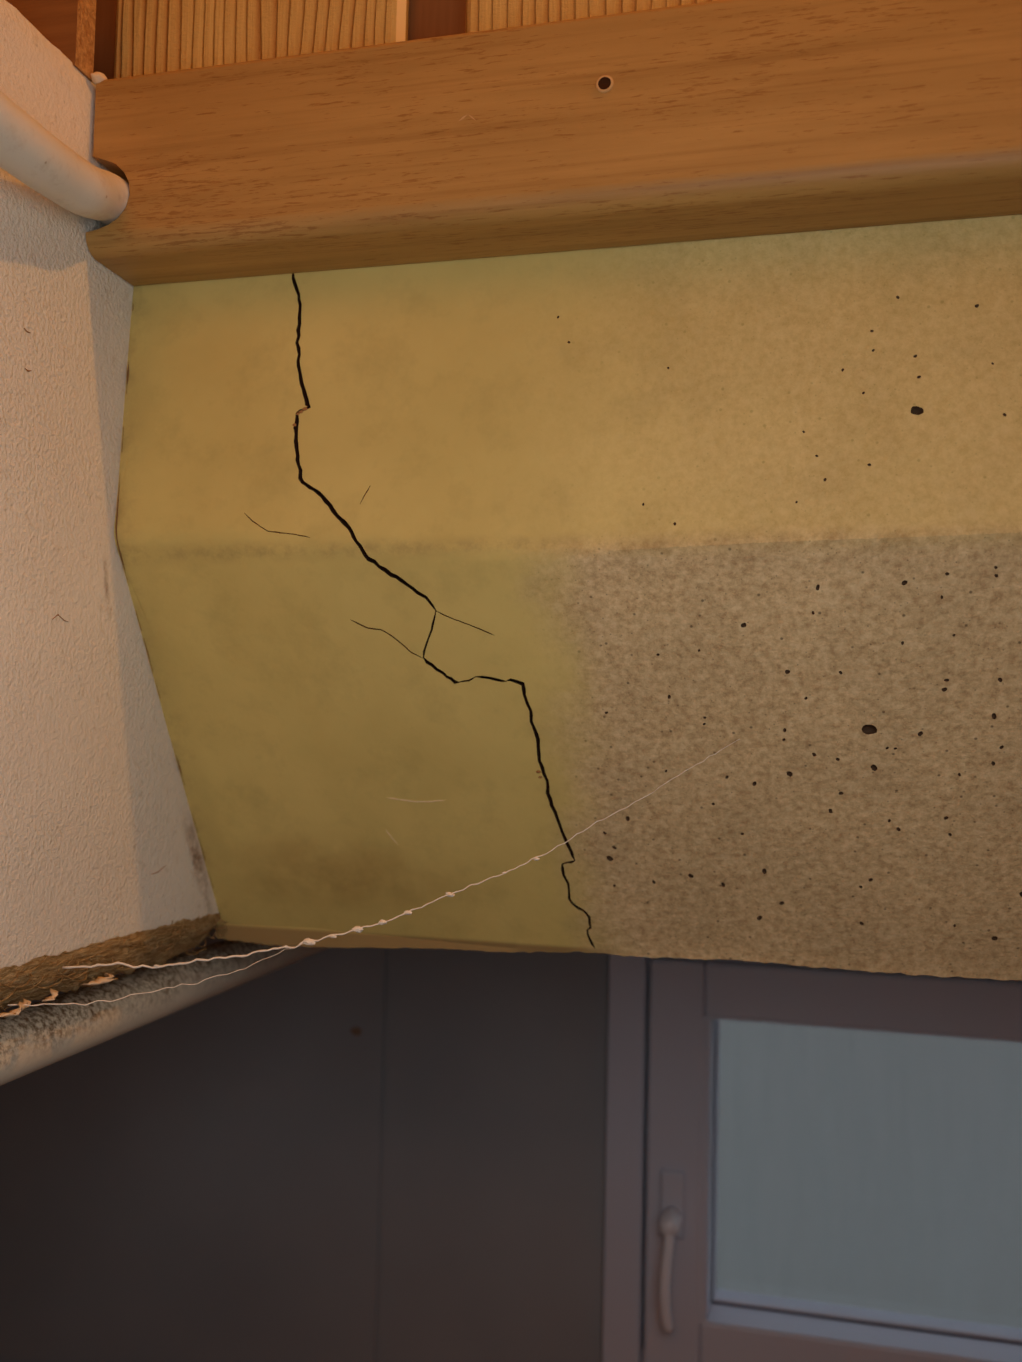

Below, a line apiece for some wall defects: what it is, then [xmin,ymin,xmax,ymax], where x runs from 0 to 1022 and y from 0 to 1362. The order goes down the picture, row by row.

crack [244,513,310,538]
crack [292,273,595,948]